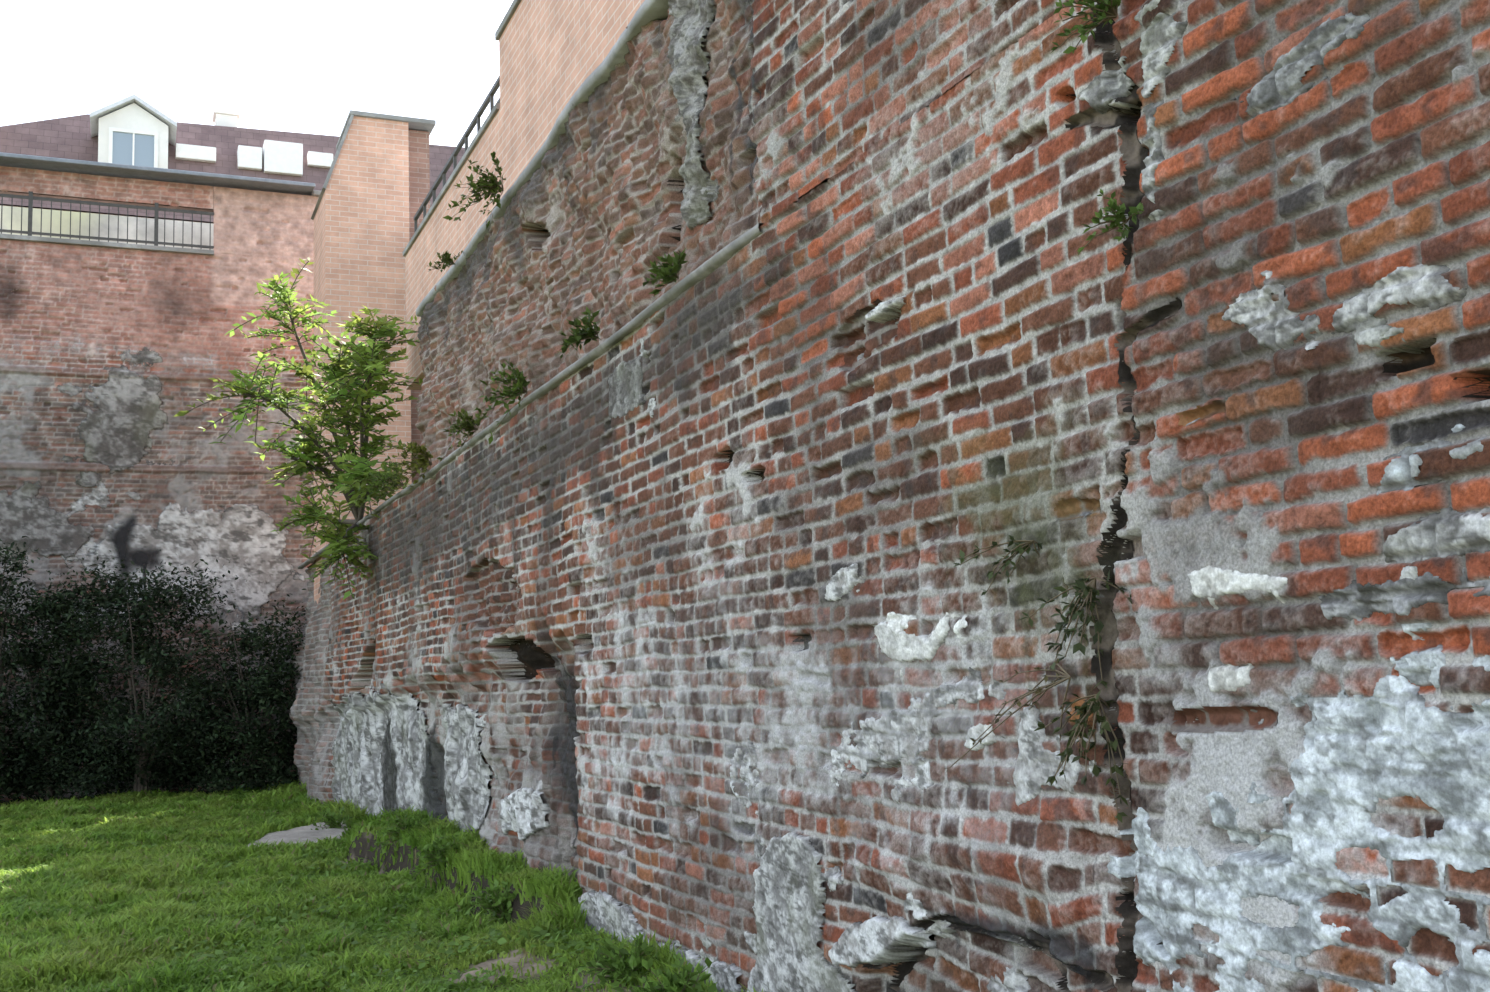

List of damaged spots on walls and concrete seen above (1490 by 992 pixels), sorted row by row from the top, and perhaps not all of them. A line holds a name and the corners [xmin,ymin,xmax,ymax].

peeling [1344,14,1371,39]
crack [1065,0,1149,269]
peeling [1305,332,1337,350]
spalling [1354,316,1436,373]
spalling [1453,370,1490,402]
peeling [66,481,140,518]
spalling [468,559,555,682]
crack [862,297,1182,992]
peeling [1107,623,1490,992]
peeling [819,866,844,892]
peeling [904,892,956,938]
peeling [744,931,757,954]